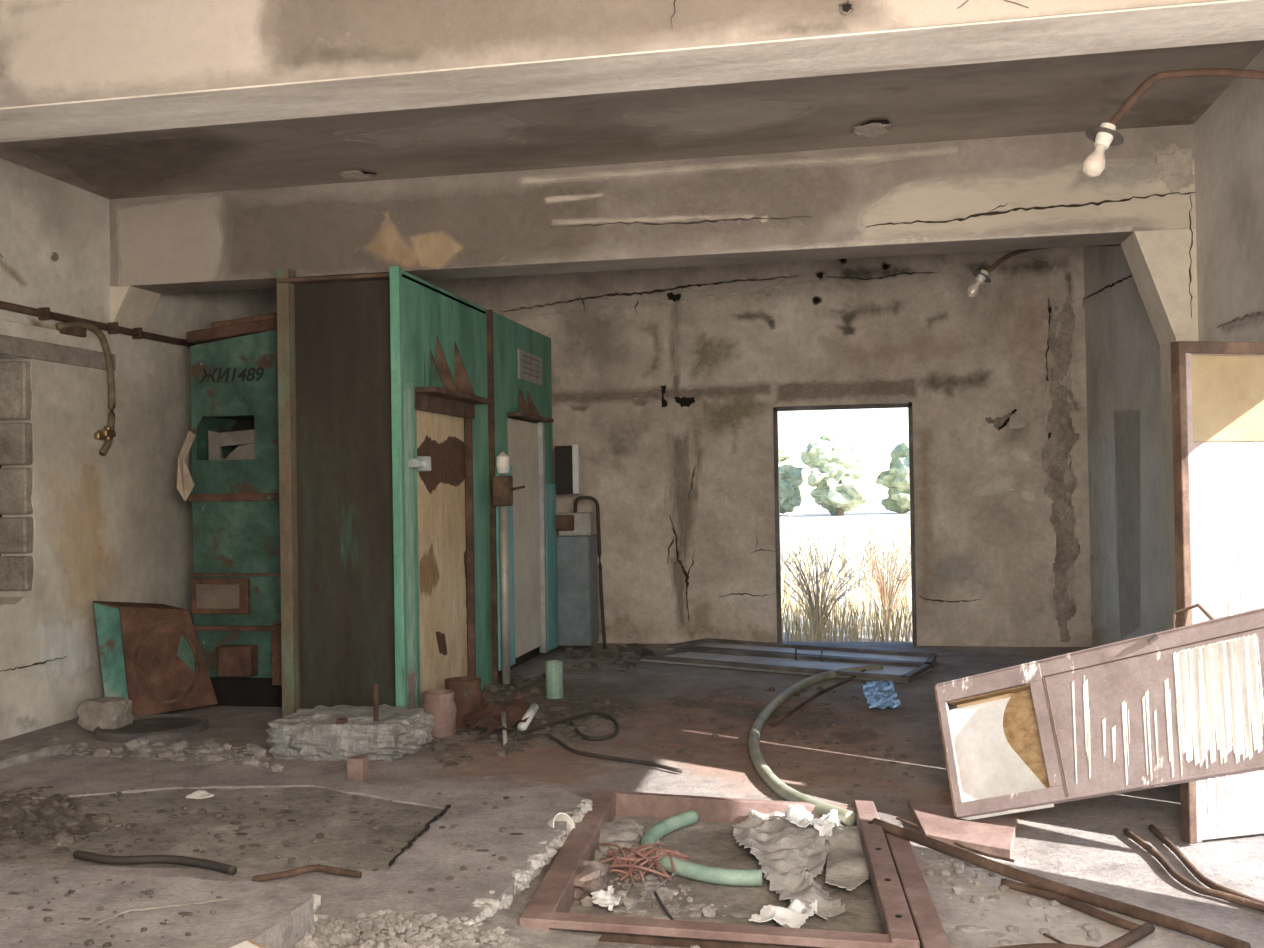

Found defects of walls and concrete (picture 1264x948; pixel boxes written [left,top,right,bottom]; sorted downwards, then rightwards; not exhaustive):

crack [500,272,939,314]
crack [866,192,1264,328]
flaking render [975,298,1080,642]
crack [667,466,696,621]
crack [0,656,66,672]